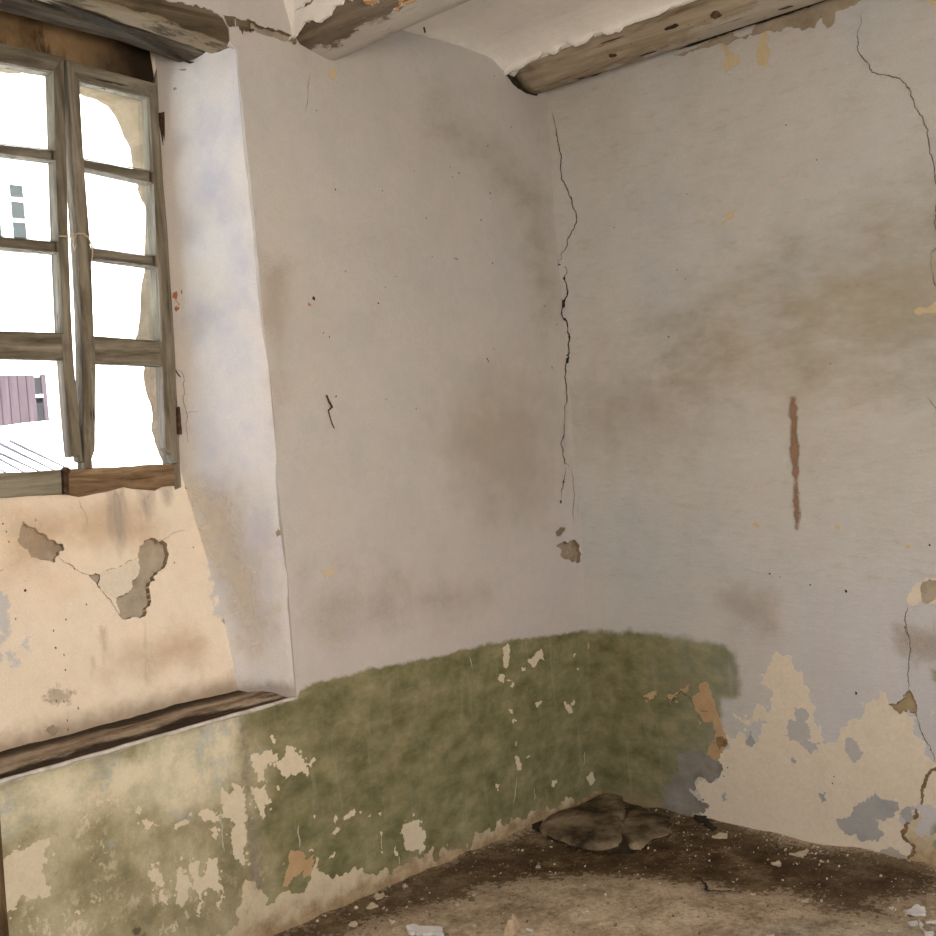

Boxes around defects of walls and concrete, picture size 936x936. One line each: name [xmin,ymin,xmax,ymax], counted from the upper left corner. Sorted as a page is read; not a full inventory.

spalling [673,0,861,76]
crack [857,15,936,184]
crack [552,114,577,519]
corrosion [789,398,800,528]
spalling [18,522,64,563]
spalling [89,538,169,619]
spalling [556,540,581,563]
peeling [498,643,514,687]
crack [903,607,911,684]
peeling [643,651,936,867]
peeling [3,838,55,919]
peeling [147,856,225,917]